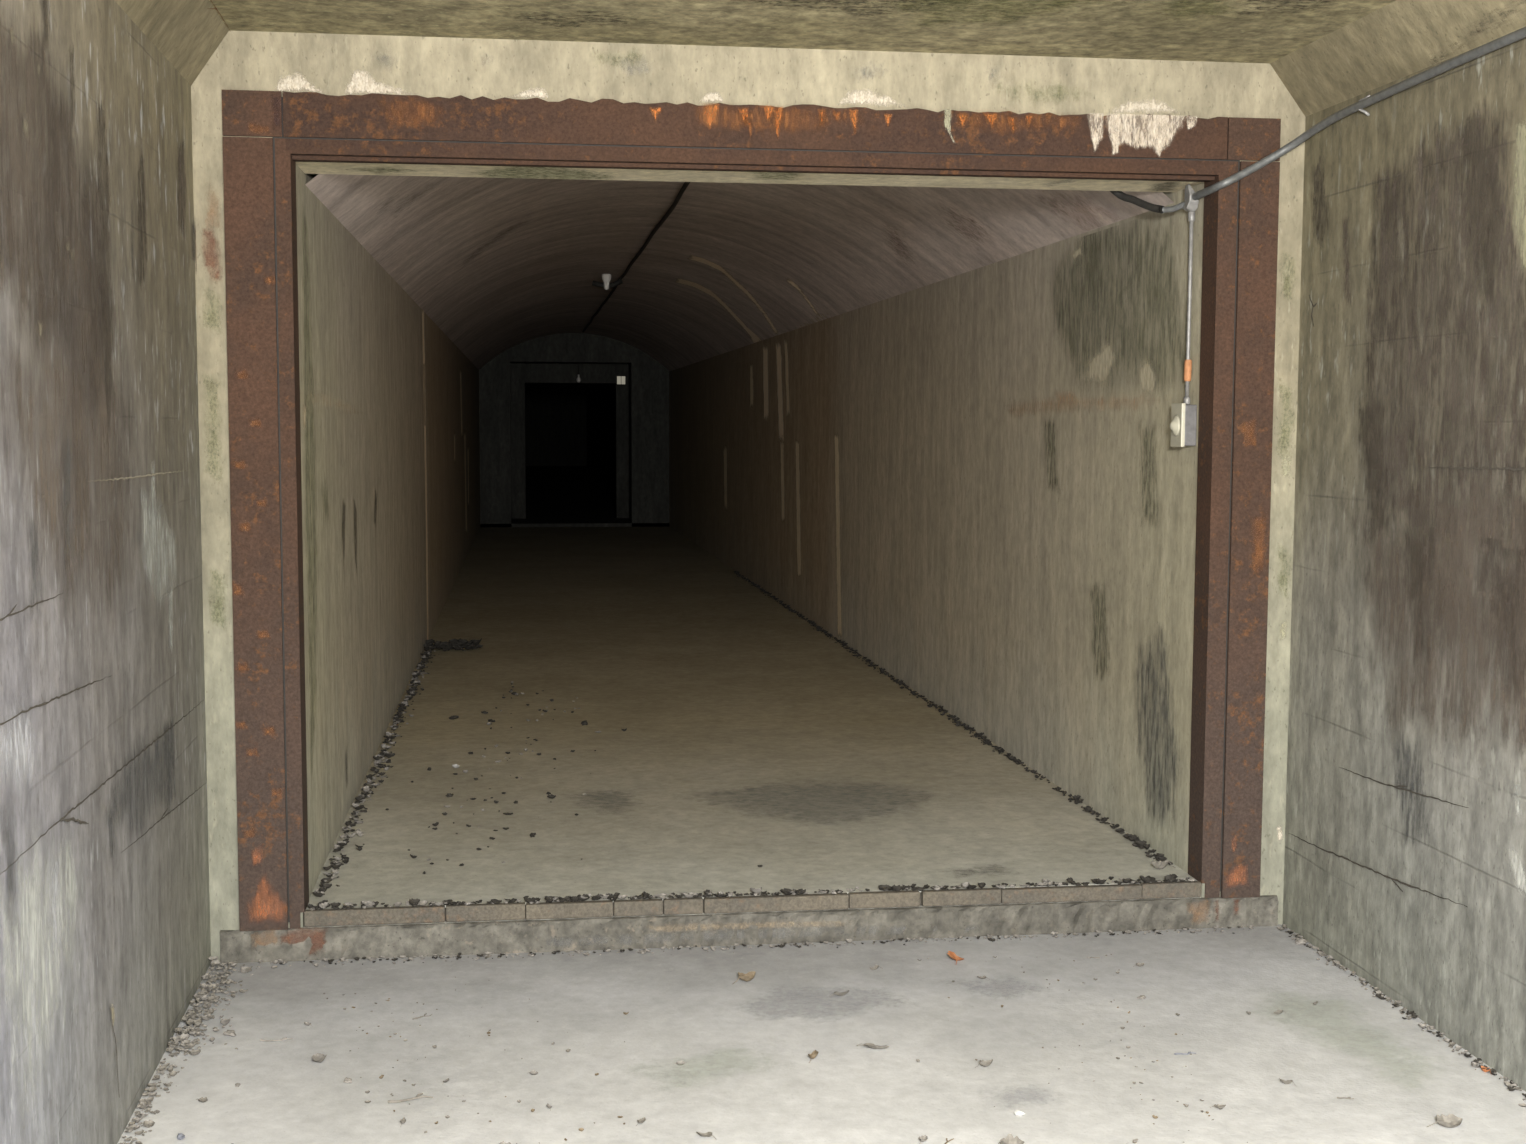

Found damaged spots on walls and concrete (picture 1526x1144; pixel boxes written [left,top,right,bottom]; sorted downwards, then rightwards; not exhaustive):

leakage [278,74,319,91]
leakage [345,71,412,95]
leakage [520,88,548,98]
corrosion [700,105,794,135]
leakage [1091,100,1197,156]
leakage [0,0,175,645]
leakage [1359,114,1526,747]
crack [88,470,184,482]
crack [0,593,63,621]
crack [0,675,112,725]
crack [3,700,204,872]
corrosion [254,881,282,918]